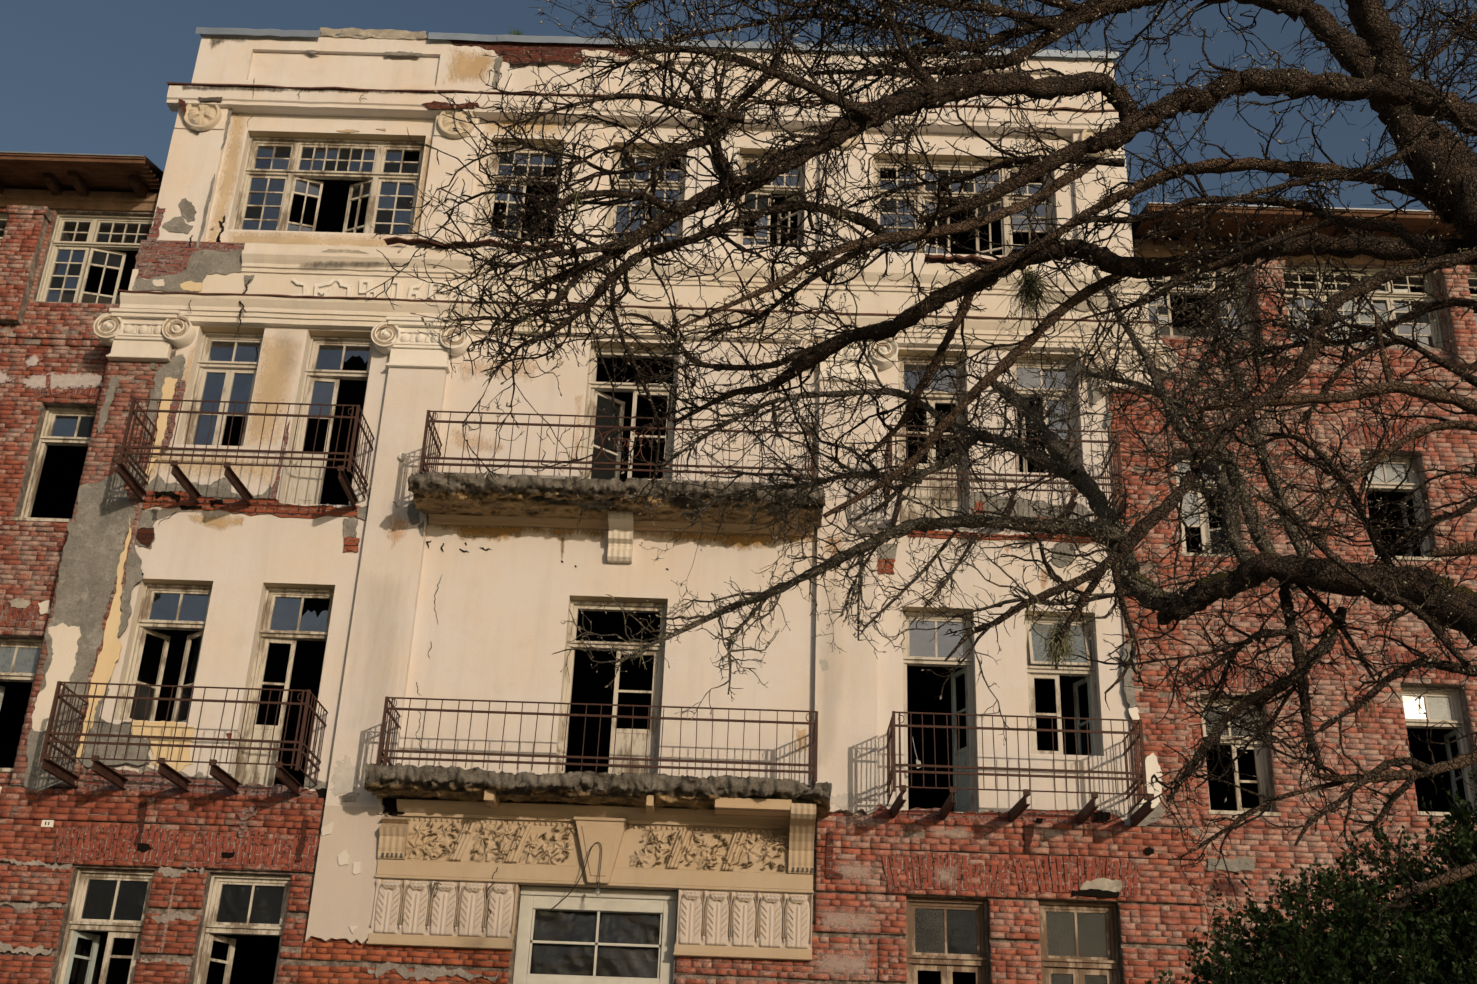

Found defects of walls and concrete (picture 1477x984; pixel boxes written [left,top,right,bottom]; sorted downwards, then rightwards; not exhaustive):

peeling [221,108,233,149]
spalling [132,174,255,293]
spalling [407,500,424,536]